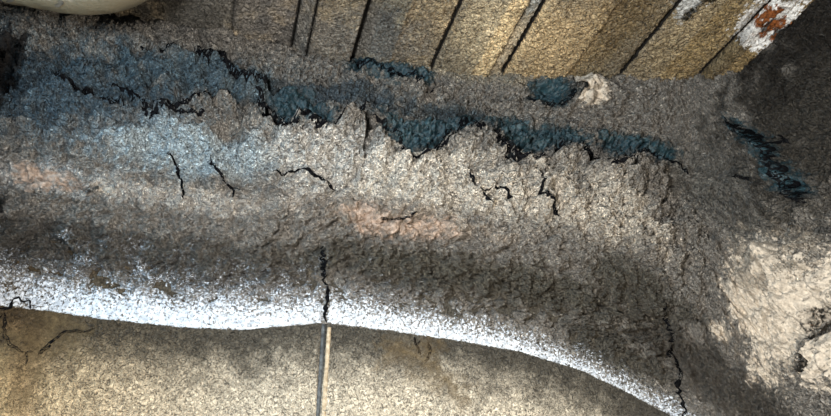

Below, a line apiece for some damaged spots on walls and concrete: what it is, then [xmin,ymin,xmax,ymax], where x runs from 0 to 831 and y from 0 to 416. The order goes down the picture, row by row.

corrosion [753,4,792,40]
spalling [527,72,612,108]
crack [51,42,689,217]
crack [379,211,418,221]
crack [319,246,333,323]
crack [0,296,94,366]
crack [663,299,687,416]